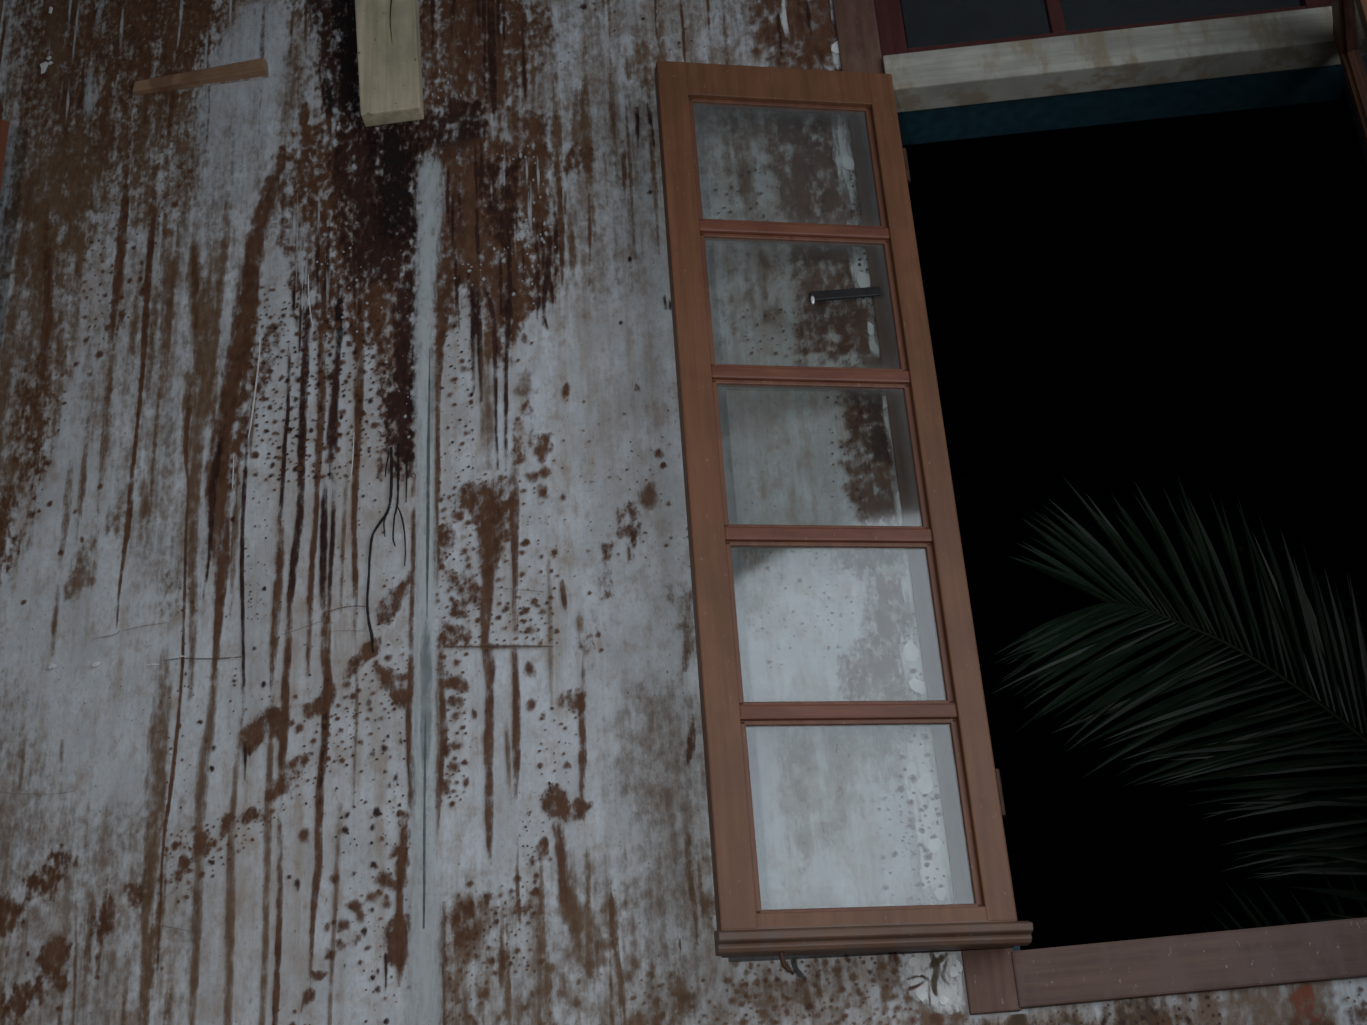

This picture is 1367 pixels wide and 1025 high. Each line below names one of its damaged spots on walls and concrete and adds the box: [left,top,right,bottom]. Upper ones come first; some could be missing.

corrosion [749,0,842,71]
corrosion [713,110,863,225]
corrosion [728,243,881,368]
corrosion [826,390,899,526]
corrosion [90,98,603,1025]
corrosion [585,437,671,599]
corrosion [679,595,693,671]
corrosion [742,549,924,701]
corrosion [681,723,706,785]
corrosion [0,844,77,936]
corrosion [1,935,72,1025]
corrosion [626,953,1367,1025]